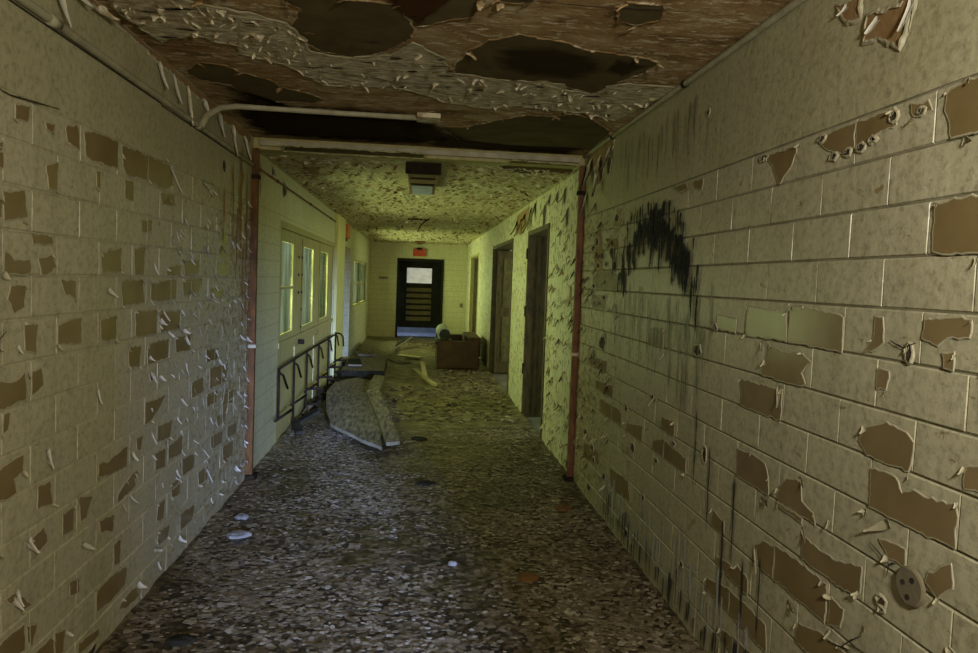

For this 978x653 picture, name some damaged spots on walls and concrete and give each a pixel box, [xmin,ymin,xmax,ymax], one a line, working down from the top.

flaking render [836,0,918,52]
peeling [816,76,978,162]
peeling [45,122,183,208]
peeling [82,0,687,505]
peeling [932,193,978,267]
peeling [96,201,253,613]
water stain [612,200,713,407]
peeling [711,305,844,424]
peeling [904,315,974,372]
peeling [0,453,29,502]
peeling [857,421,959,567]
peeling [0,589,99,653]